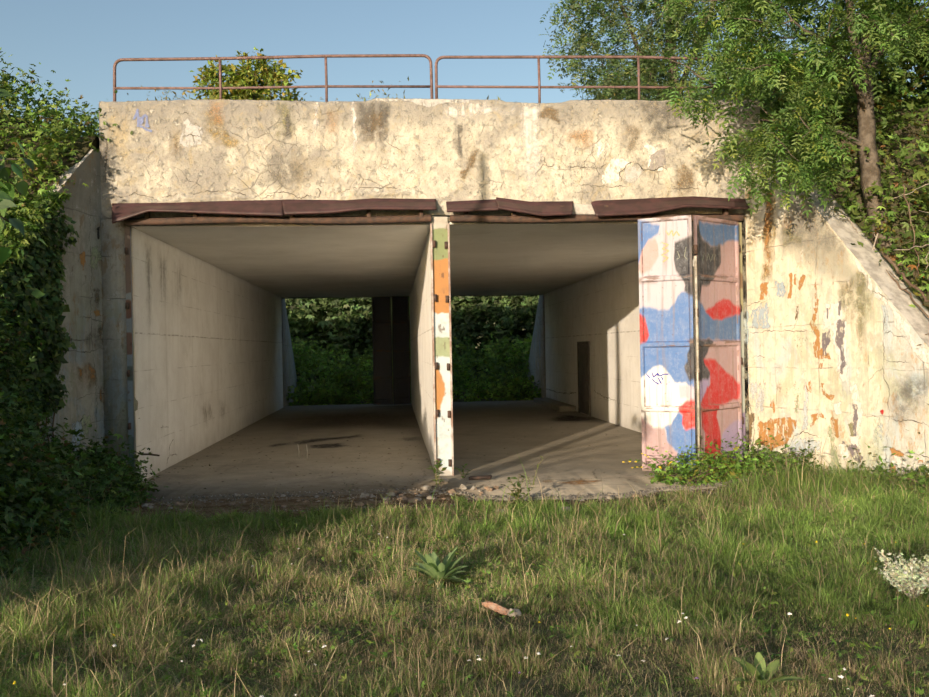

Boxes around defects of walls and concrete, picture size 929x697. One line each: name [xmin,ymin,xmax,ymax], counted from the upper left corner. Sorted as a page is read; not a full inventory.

leakage [351,103,389,142]
crack [504,147,625,189]
corrosion [763,192,776,257]
crack [749,301,815,333]
peeling [747,273,929,476]
crack [865,291,929,468]